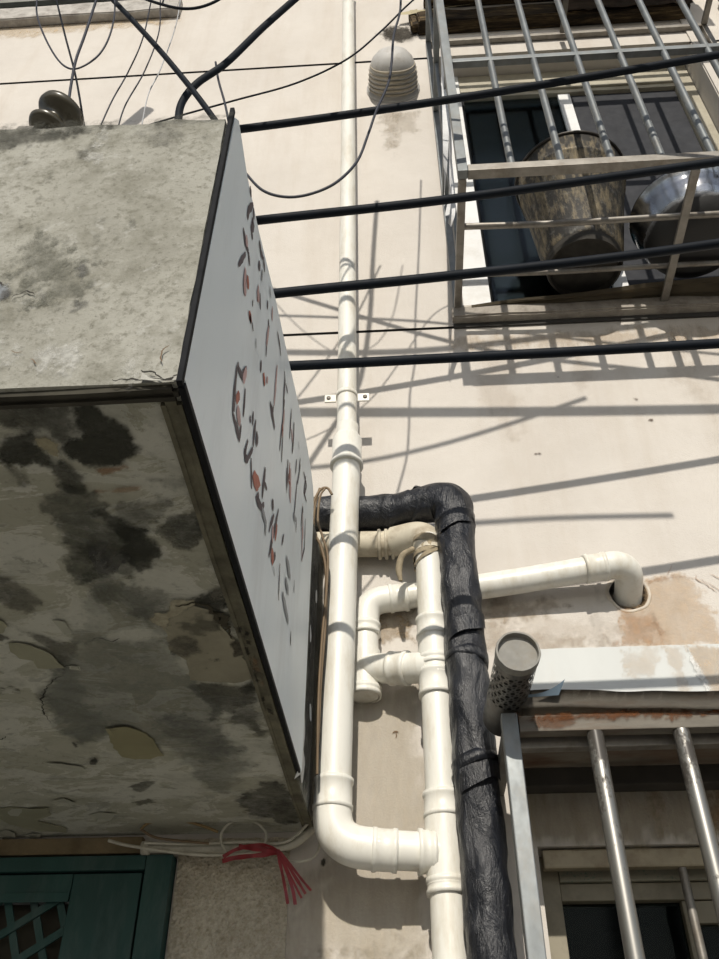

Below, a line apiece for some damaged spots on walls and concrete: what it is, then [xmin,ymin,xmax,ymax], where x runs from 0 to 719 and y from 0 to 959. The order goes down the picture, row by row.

damp [0,405,203,585]
damp [193,594,228,613]
peeling [150,600,259,683]
damp [189,683,265,735]
rust [534,708,719,720]
peeling [106,727,164,759]
damp [132,782,153,805]
damp [239,781,299,825]